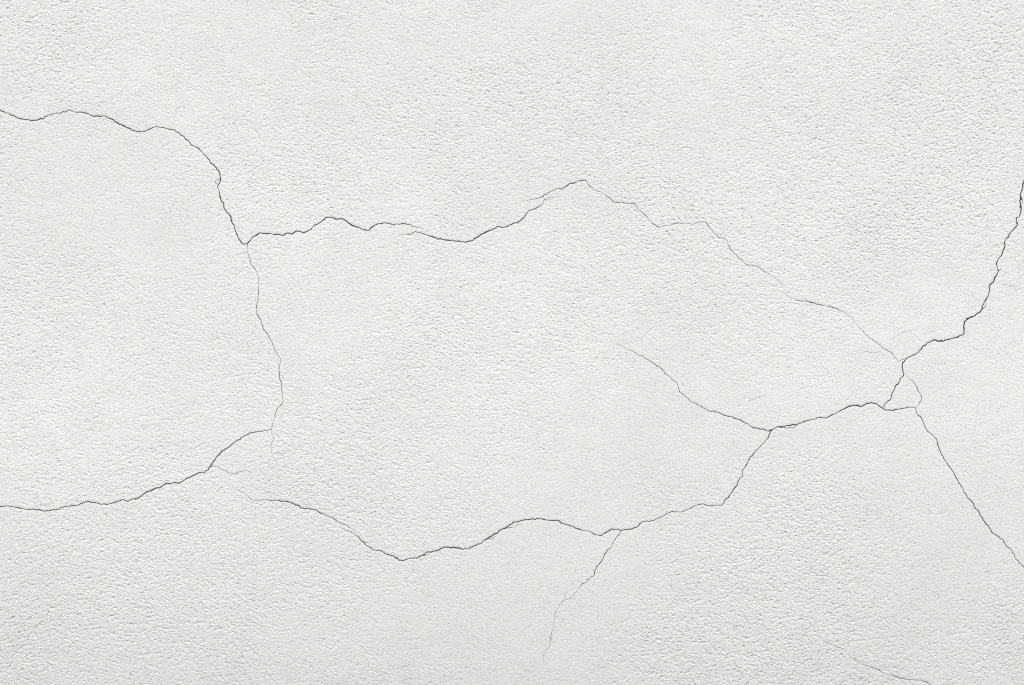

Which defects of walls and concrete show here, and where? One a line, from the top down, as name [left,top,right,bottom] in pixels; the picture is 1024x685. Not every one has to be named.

crack [0,110,1024,657]